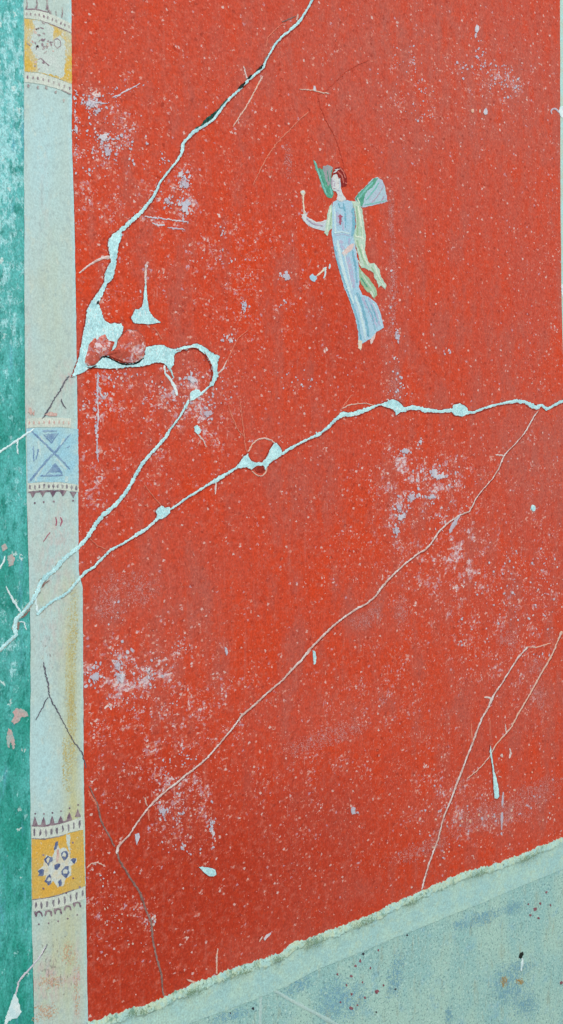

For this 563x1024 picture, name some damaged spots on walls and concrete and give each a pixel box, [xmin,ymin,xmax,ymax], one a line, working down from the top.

crack [119,0,314,233]
crack [253,60,369,185]
crack [0,376,69,454]
spalling [71,228,248,453]
crack [0,395,563,996]
peeling [198,866,217,877]